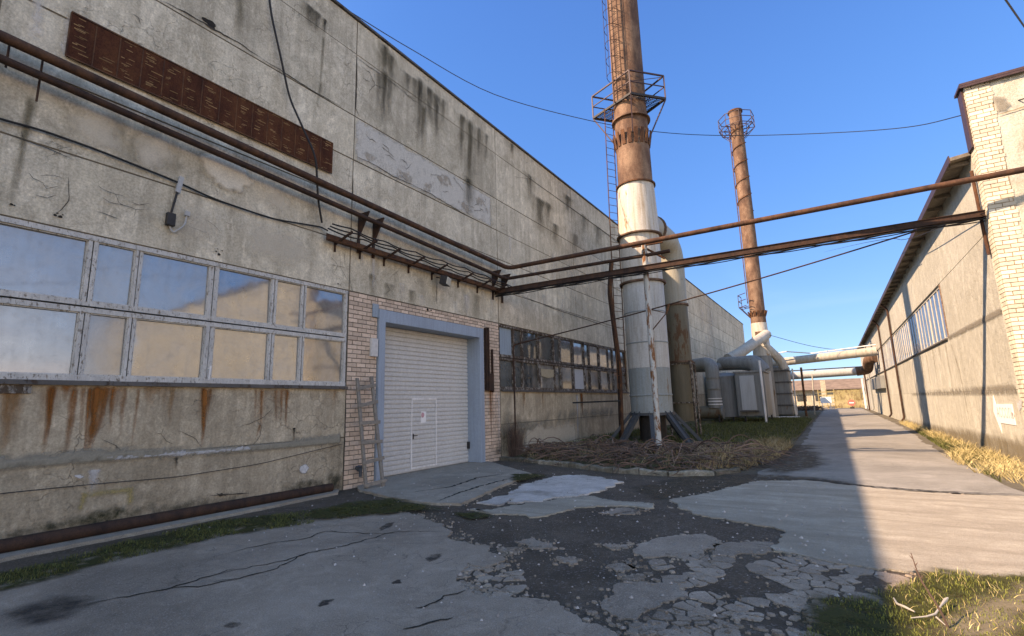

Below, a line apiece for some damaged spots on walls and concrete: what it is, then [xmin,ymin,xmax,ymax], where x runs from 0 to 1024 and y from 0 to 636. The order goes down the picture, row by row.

peeling [356,121,490,225]
rust [46,387,139,442]
rust [202,389,211,434]
crack [90,531,422,604]